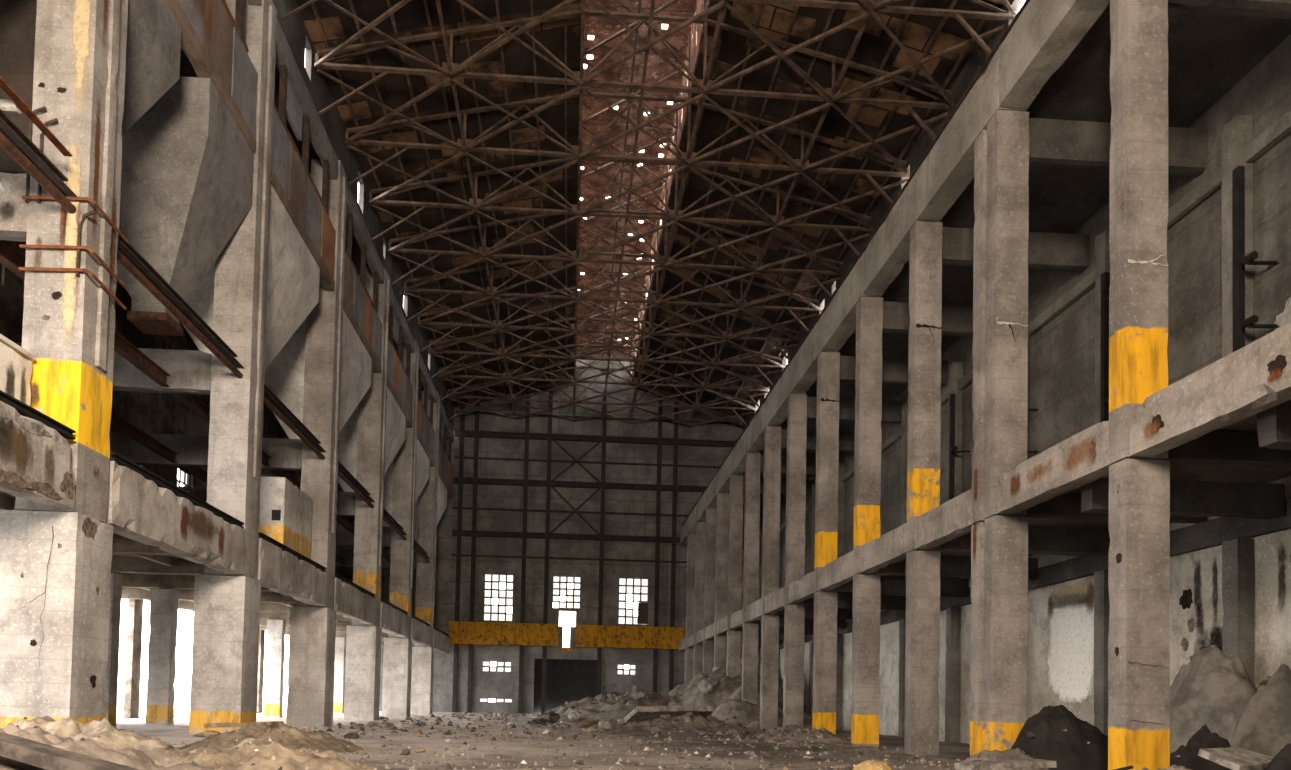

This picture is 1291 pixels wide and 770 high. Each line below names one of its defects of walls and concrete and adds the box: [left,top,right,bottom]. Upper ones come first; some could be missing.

flaking render [1274,297,1291,330]
rust [1011,464,1049,494]
rust [1067,441,1096,466]
water stain [1194,562,1218,629]
water stain [1278,547,1286,601]
flaking render [1047,592,1094,704]